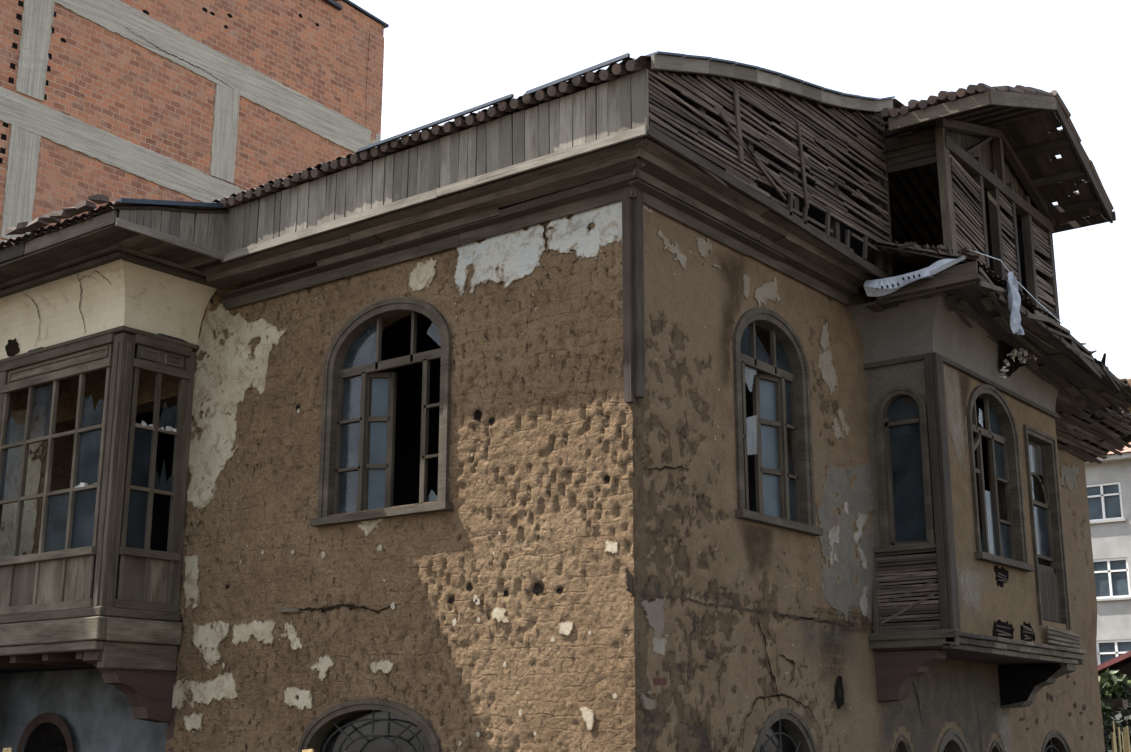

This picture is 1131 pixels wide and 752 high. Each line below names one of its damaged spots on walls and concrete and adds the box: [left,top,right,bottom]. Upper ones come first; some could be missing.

spalling [651,84,868,261]
crack [78,271,111,329]
peeling [828,501,868,569]
crack [279,603,400,613]
peeling [859,586,868,617]
crack [632,590,873,749]